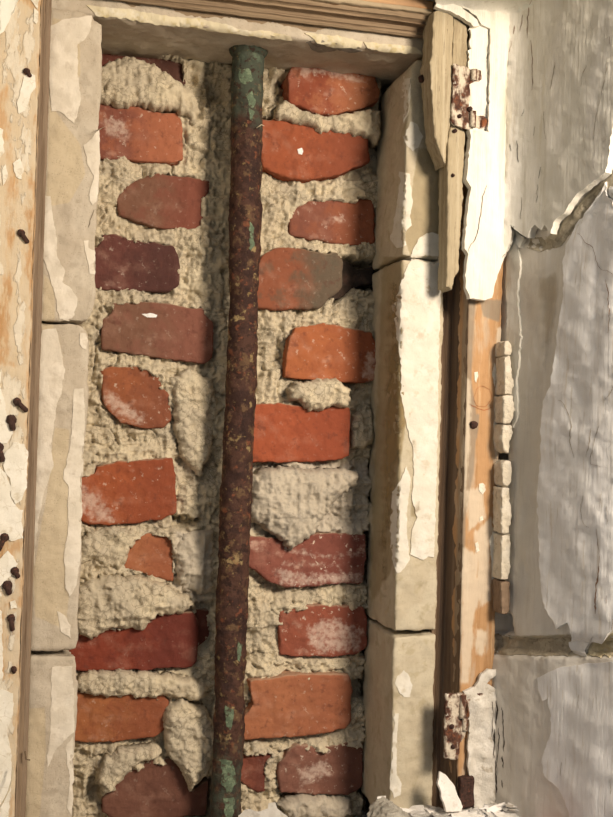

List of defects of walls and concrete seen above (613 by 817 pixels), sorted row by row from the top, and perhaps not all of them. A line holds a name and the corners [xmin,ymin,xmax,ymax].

peeling [49,5,292,123]
crack [509,0,555,88]
peeling [83,127,104,205]
peeling [44,196,78,321]
peeling [0,328,65,553]
peeling [63,388,85,596]
peeling [390,171,441,573]
peeling [435,0,613,817]
peeling [0,551,18,597]
peeling [0,600,17,817]
peeling [47,666,75,815]
peeling [376,713,402,799]